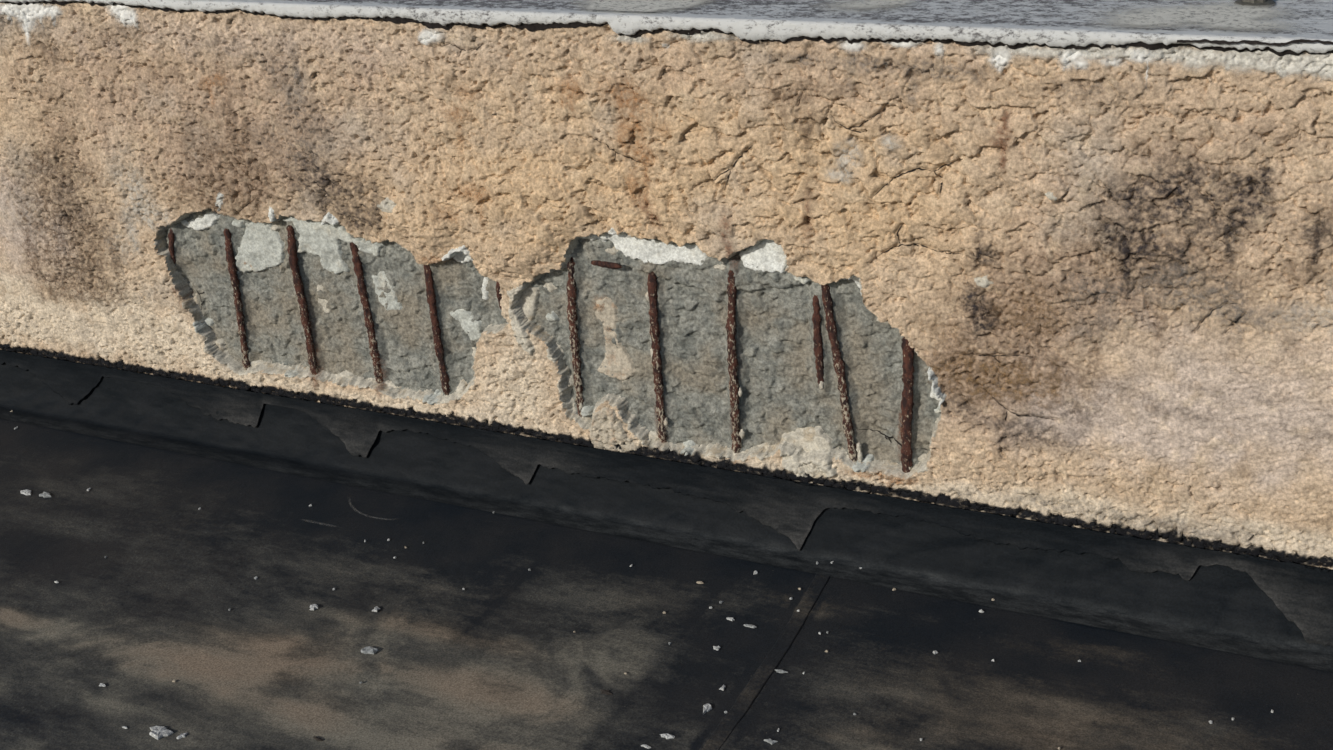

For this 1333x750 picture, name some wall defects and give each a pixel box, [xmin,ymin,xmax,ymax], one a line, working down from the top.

corrosion [223,228,251,370]
corrosion [286,225,318,375]
corrosion [350,242,384,383]
corrosion [423,265,451,395]
spalling [154,192,947,480]
corrosion [566,257,584,417]
corrosion [591,260,622,269]
corrosion [645,272,669,443]
corrosion [725,270,745,453]
corrosion [812,284,915,484]
leakage [939,292,1056,400]
leakage [1103,166,1272,290]